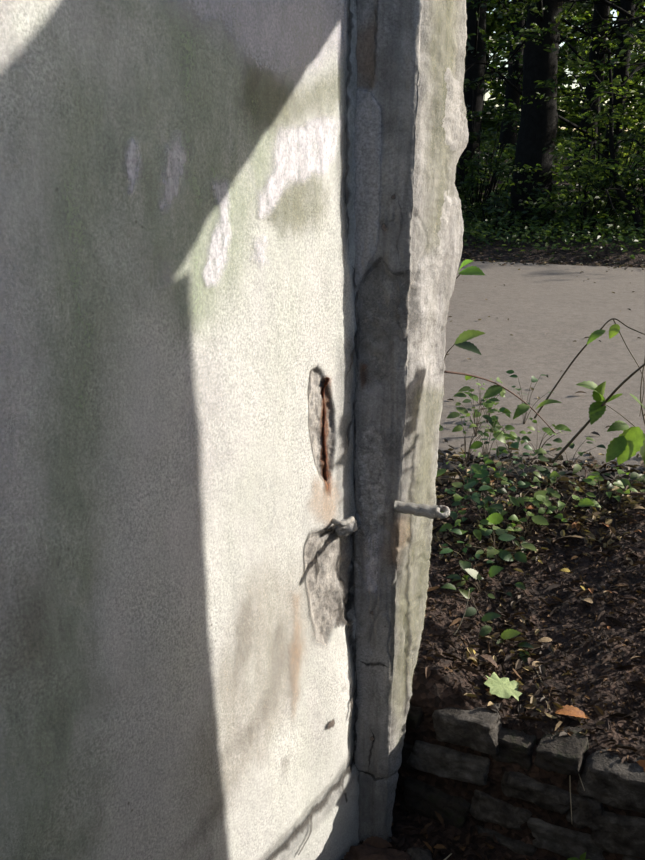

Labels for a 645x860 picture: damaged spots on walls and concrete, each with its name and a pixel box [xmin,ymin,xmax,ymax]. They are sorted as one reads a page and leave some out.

crack [344,0,378,459]
spalling [308,367,335,493]
crack [268,535,388,860]